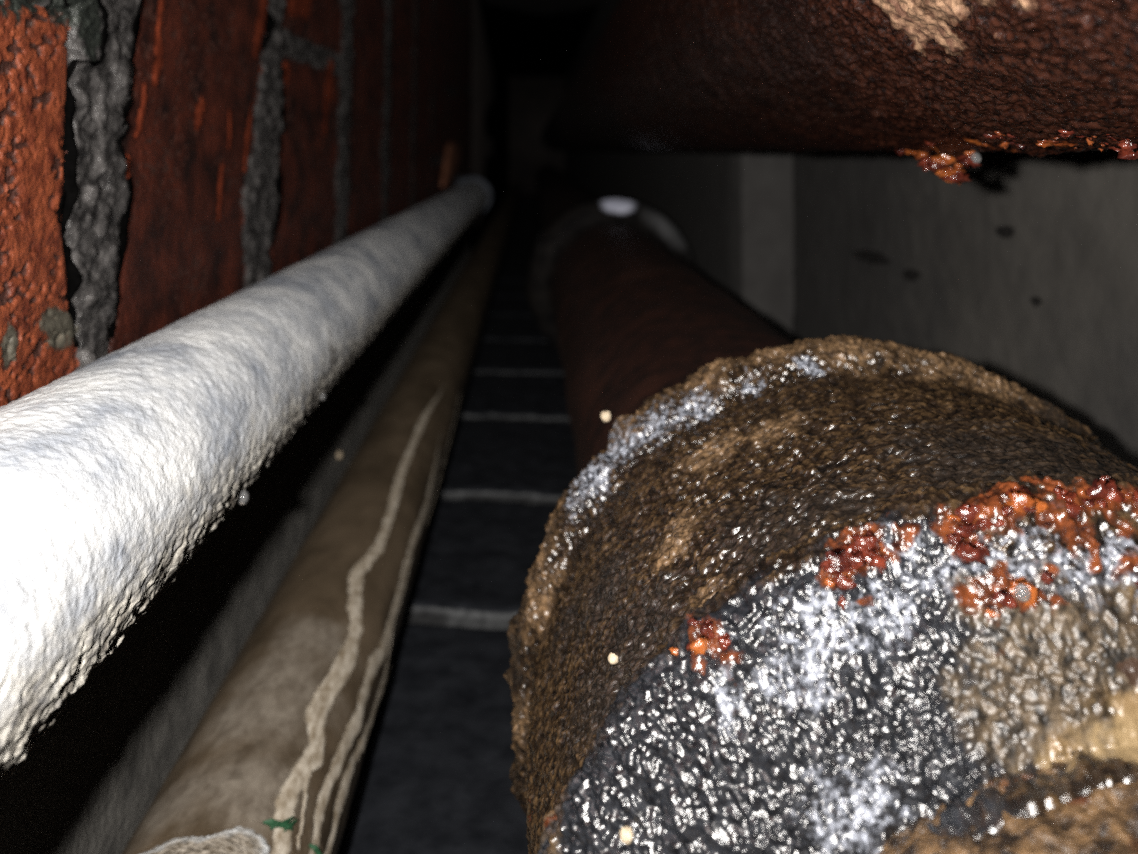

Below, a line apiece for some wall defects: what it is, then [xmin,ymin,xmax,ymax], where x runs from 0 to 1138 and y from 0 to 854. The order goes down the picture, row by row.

rust [895,130,1138,185]
rust [946,476,1138,566]
rust [818,530,890,610]
rust [985,569,1054,618]
rust [669,618,731,656]